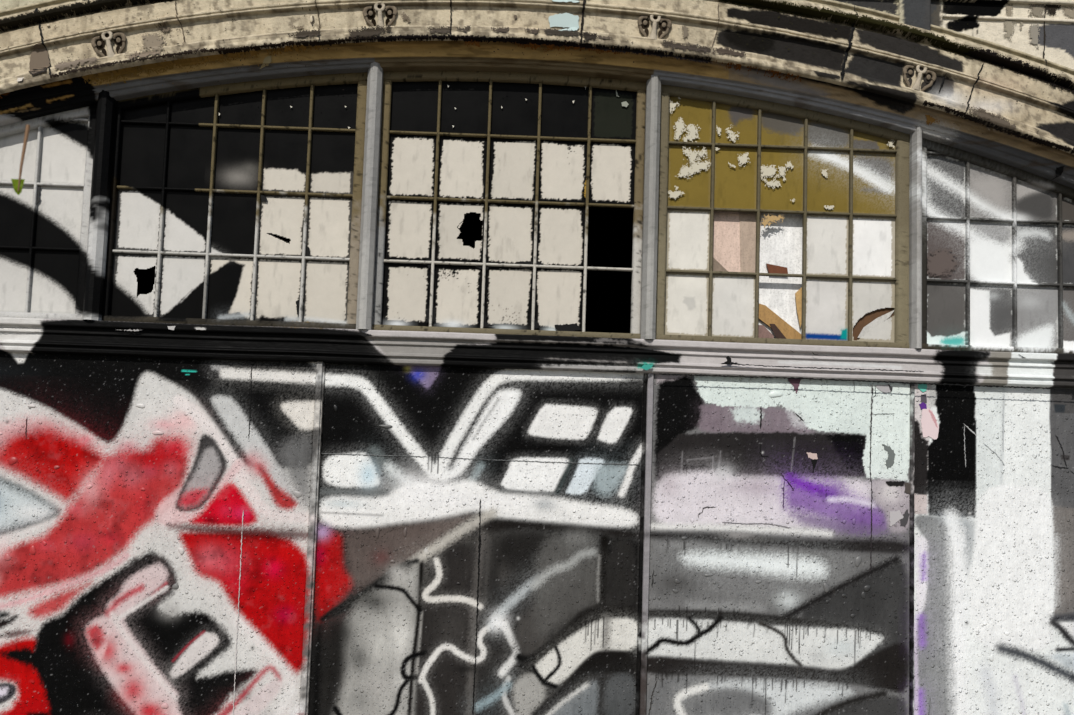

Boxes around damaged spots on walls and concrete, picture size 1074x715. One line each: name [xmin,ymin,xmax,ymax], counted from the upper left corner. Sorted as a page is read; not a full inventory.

spalling [17,43,50,82]
peeling [668,97,750,200]
peeling [761,162,794,189]
crack [472,499,481,715]